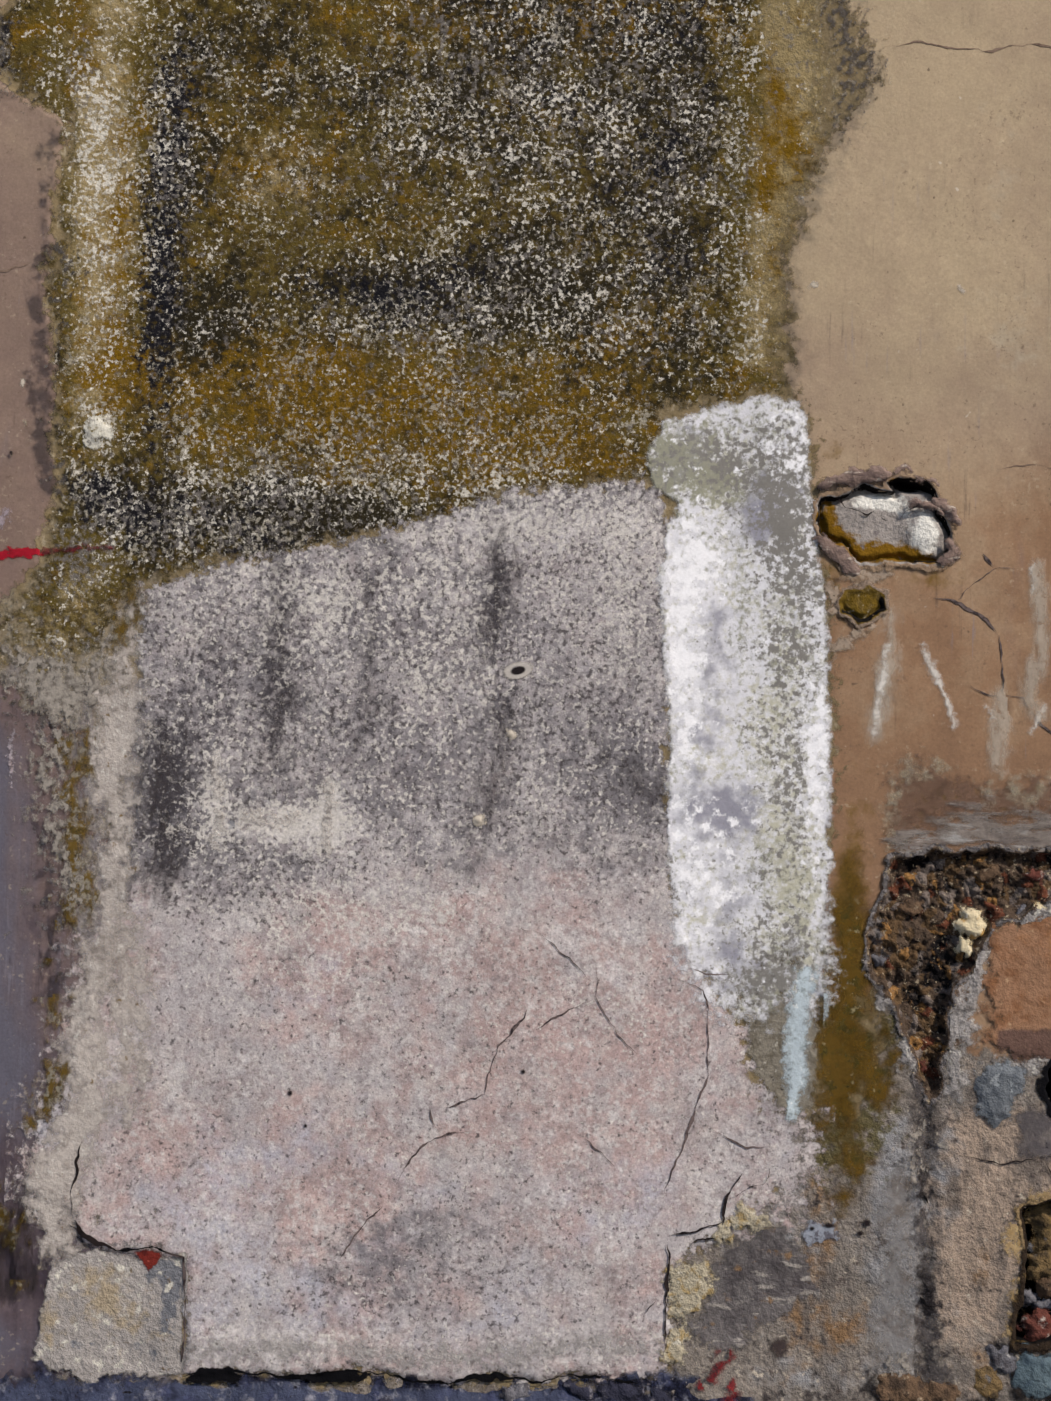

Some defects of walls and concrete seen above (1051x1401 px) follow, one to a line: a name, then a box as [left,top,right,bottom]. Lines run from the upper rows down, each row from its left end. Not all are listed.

crack [900,40,1051,53]
flaking render [0,0,680,1022]
spalling [653,0,964,855]
crack [936,554,1051,733]
crack [341,928,635,1257]
flaking render [108,754,1051,1401]
crack [647,967,771,1349]
damp [811,858,903,1207]
damp [902,1084,937,1182]